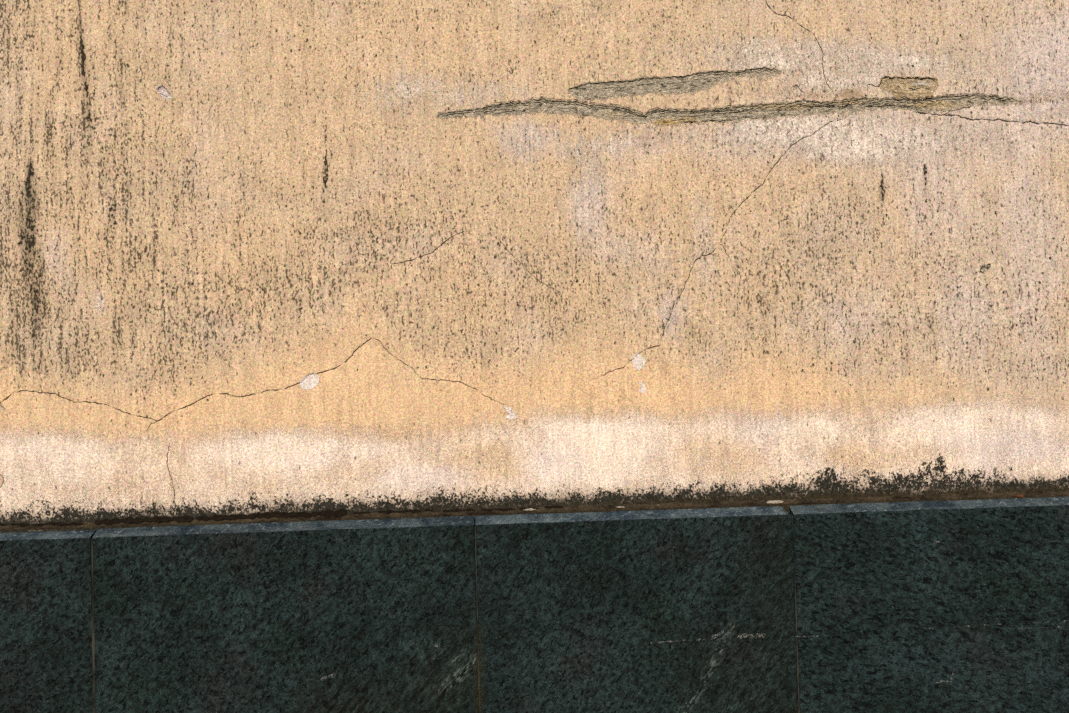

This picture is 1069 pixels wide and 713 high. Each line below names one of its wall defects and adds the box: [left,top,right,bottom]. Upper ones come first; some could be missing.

damp [79,32,93,129]
spalling [437,66,1023,127]
crack [766,1,834,94]
crack [913,106,1067,126]
damp [18,159,45,367]
crack [601,115,849,376]
crack [1,337,502,431]
damp [0,400,1069,541]